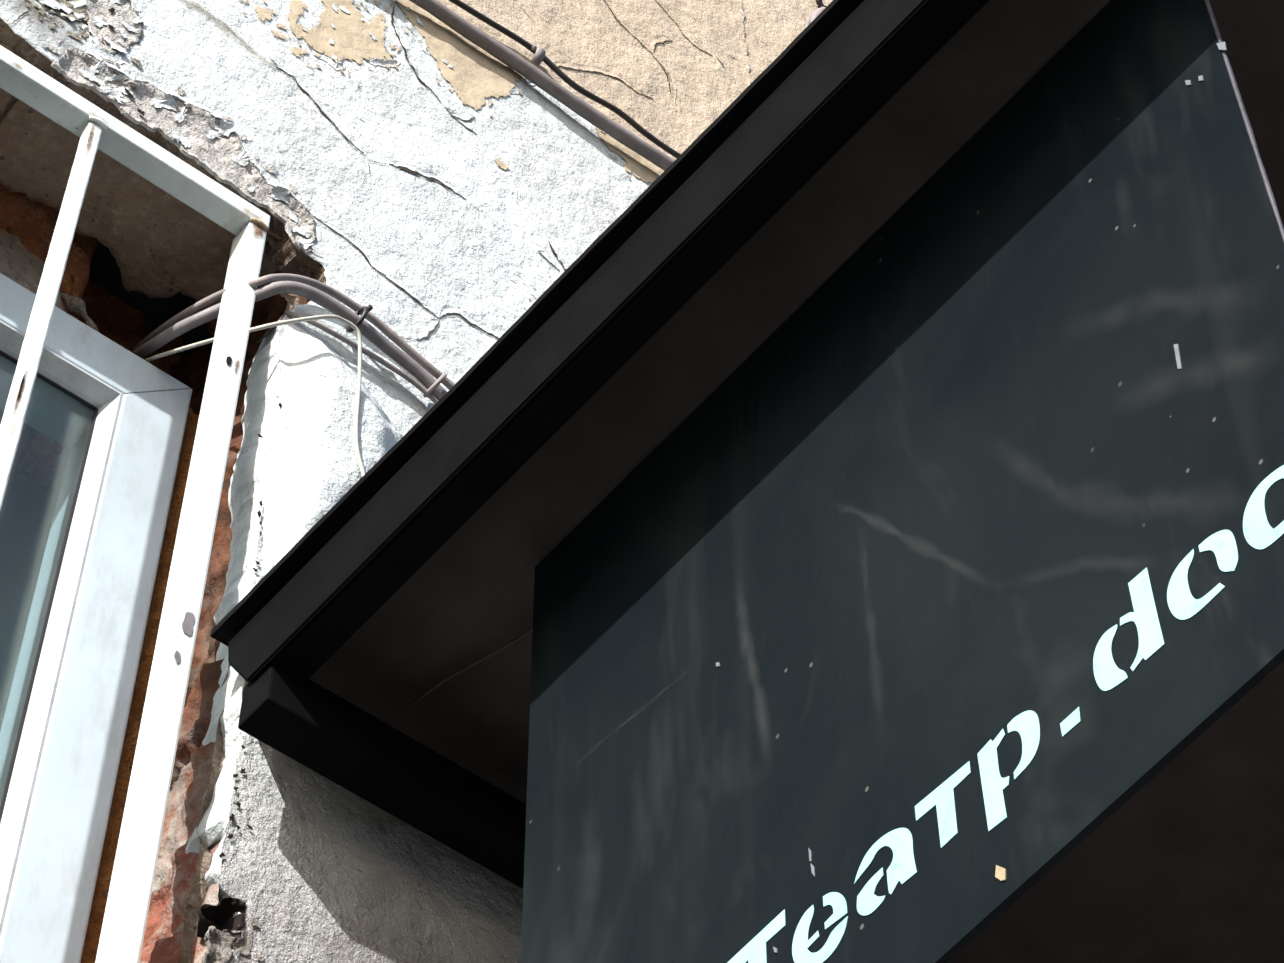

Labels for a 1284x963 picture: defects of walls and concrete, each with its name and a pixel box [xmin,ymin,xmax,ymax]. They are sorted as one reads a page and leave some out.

peeling [241,0,535,117]
crack [555,0,737,111]
spalling [25,0,325,256]
crack [69,0,506,340]
spalling [219,768,253,858]
spalling [197,897,265,963]